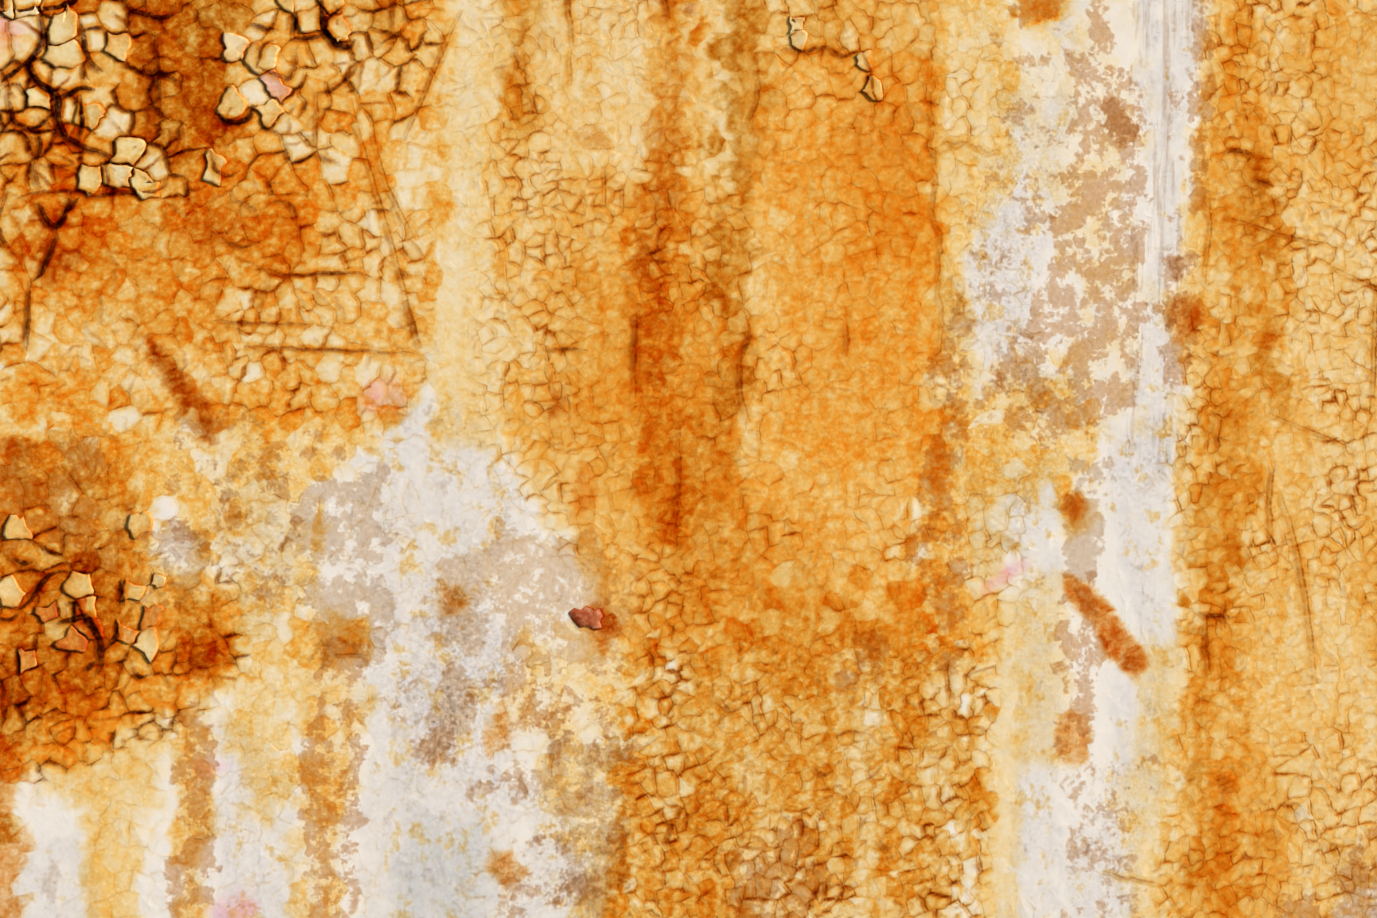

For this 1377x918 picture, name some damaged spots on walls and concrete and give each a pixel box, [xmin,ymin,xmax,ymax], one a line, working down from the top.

rust [130,0,245,149]
rust [691,2,760,86]
crack [0,0,445,417]
crack [484,24,752,512]
rust [712,225,737,319]
spalling [153,342,210,413]
crack [1177,0,1377,702]
rust [68,557,122,633]
crack [0,471,248,781]
peeling [568,606,605,631]
crack [614,324,999,918]
spalling [1067,584,1145,667]